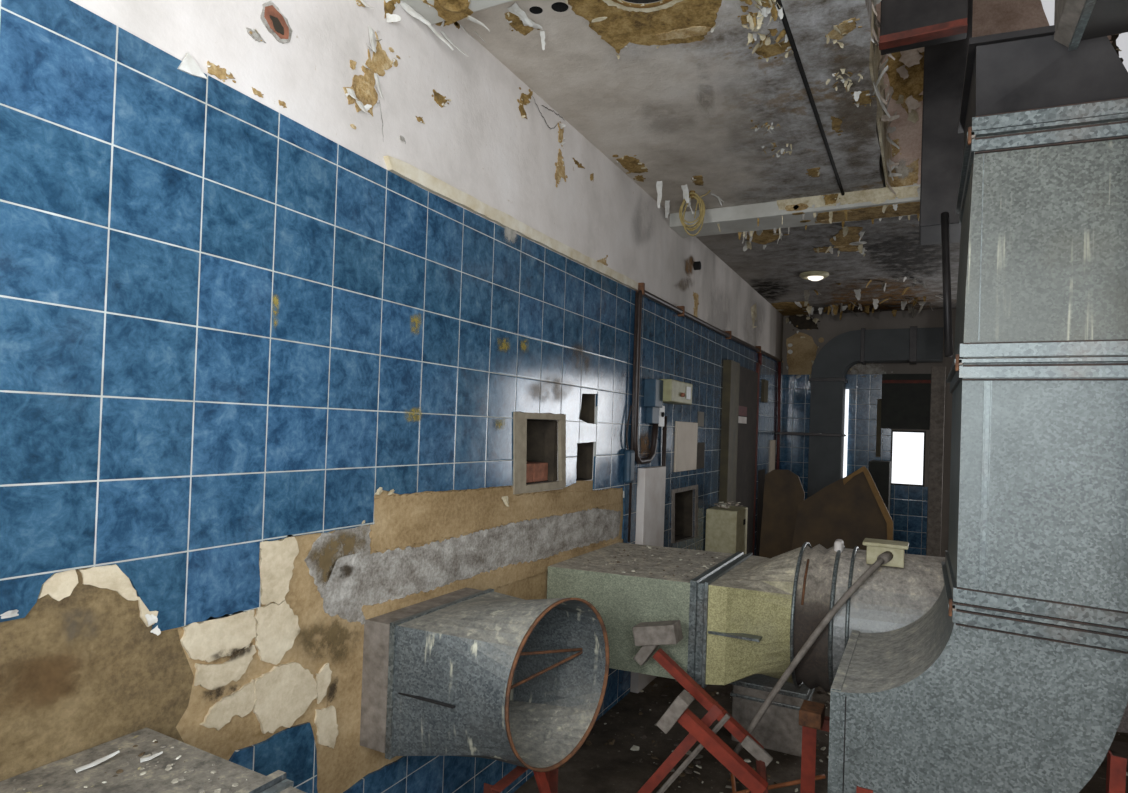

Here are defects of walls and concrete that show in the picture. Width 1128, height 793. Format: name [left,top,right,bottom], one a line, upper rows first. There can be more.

spalling [246,0,292,44]
peeling [505,2,545,50]
spalling [565,0,722,59]
peeling [178,52,236,83]
peeling [343,0,490,129]
peeling [517,87,533,119]
peeling [555,121,594,187]
spalling [738,0,924,256]
peeling [613,155,723,218]
spalling [771,277,943,379]
peeling [0,481,623,793]